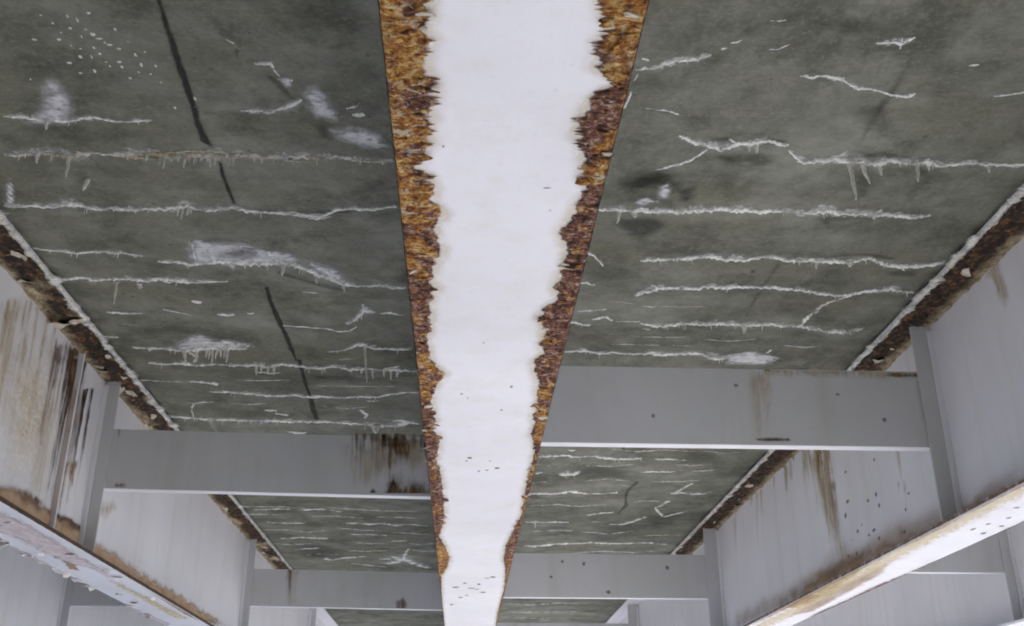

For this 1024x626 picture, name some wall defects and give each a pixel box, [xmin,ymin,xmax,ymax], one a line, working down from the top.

crack [3,61,397,220]
water stain [627,173,668,193]
corrosion [0,212,179,496]
crack [33,240,419,434]
corrosion [355,0,450,626]
corrosion [496,0,649,626]
corrosion [811,187,1024,377]
corrosion [207,494,292,579]
corrosion [671,438,834,555]
corrosion [744,479,1024,626]